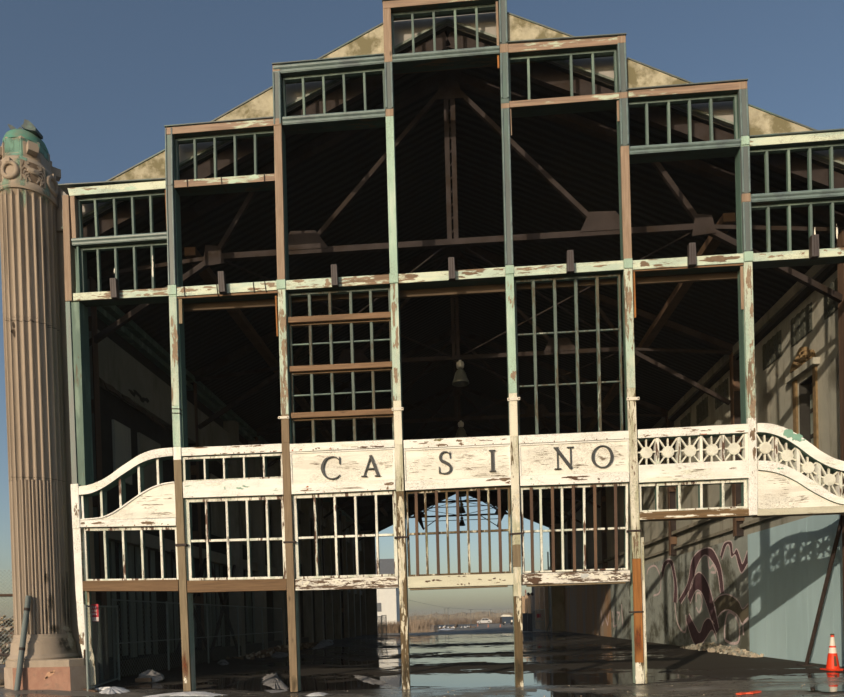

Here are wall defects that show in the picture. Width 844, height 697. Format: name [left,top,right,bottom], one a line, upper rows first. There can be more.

peeling [278,309,286,361]
peeling [391,301,399,349]
peeling [736,387,756,460]
peeling [783,429,806,442]